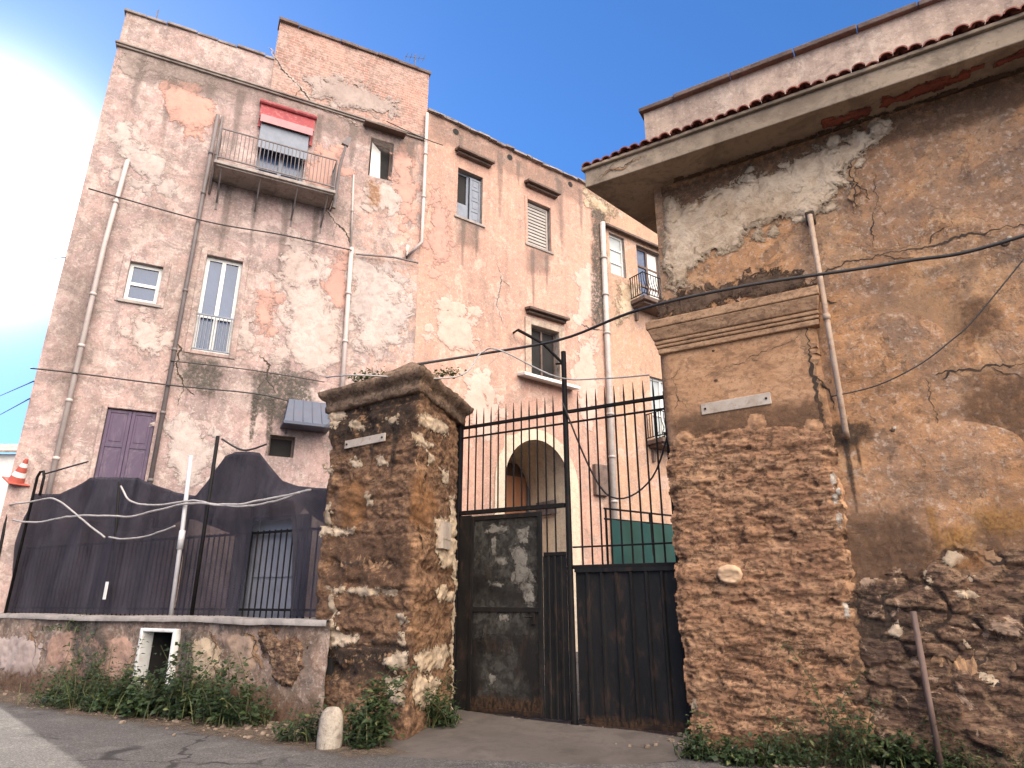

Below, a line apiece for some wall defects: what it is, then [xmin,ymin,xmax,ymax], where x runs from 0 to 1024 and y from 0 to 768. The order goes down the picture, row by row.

flaking render [115,48,222,142]
crack [269,47,359,126]
flaking render [302,140,459,280]
flaking render [652,109,894,319]
crack [807,158,1024,304]
flaking render [230,230,483,403]
crack [164,344,195,406]
mould [250,364,314,453]
crack [705,327,834,438]
crack [926,355,1024,423]
flaking render [188,618,309,687]